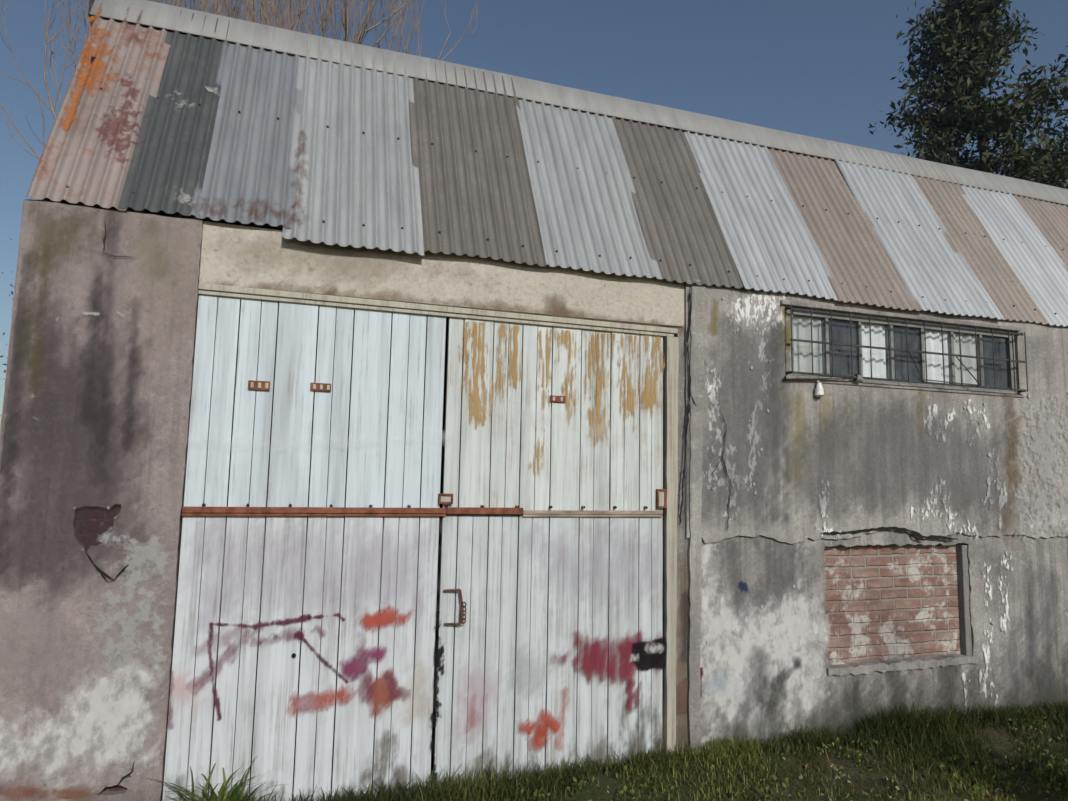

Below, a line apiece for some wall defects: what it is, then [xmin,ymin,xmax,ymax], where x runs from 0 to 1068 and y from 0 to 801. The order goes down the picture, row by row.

corrosion [62,4,143,169]
corrosion [550,301,583,319]
water stain [703,288,796,521]
water stain [922,398,990,446]
water stain [815,478,843,538]
crack [822,527,958,541]
water stain [907,477,978,538]
water stain [982,448,1013,529]
peeling [0,504,169,787]